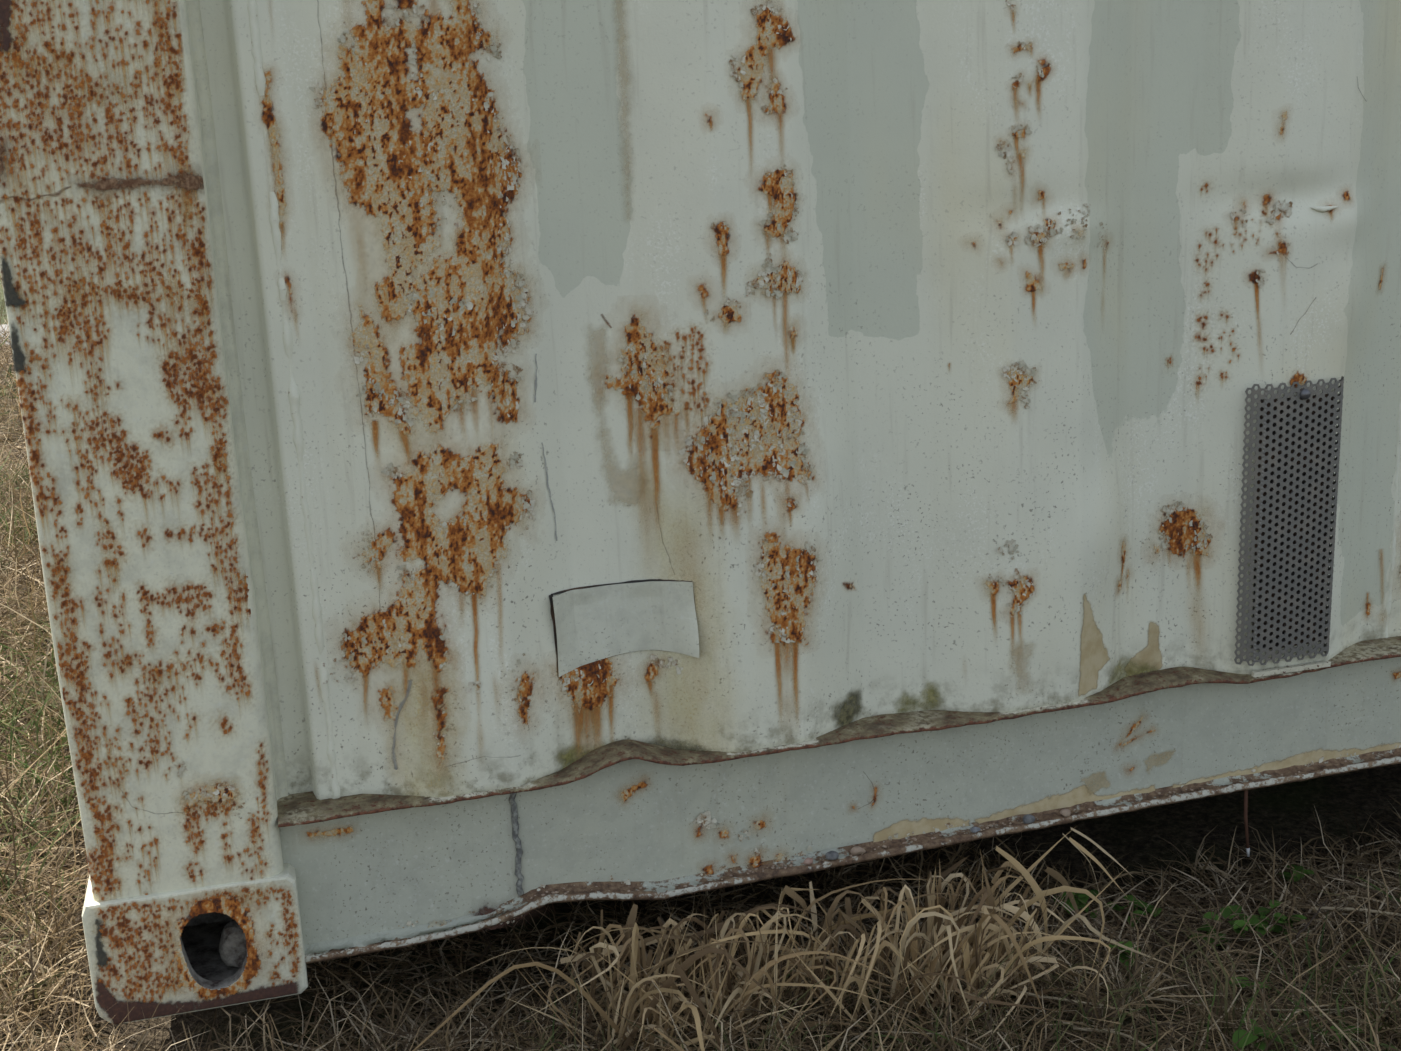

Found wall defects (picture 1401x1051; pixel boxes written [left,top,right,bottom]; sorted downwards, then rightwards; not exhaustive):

rust [729,1,796,150]
rust [758,164,800,245]
rust [309,0,537,765]
rust [605,220,815,525]
rust [1154,501,1213,586]
rust [755,532,822,704]
peeling [1078,594,1110,696]
peeling [1124,622,1162,671]
rust [556,658,620,746]
peeling [873,785,1155,842]
peeling [1172,743,1401,788]
rust [172,892,262,1000]